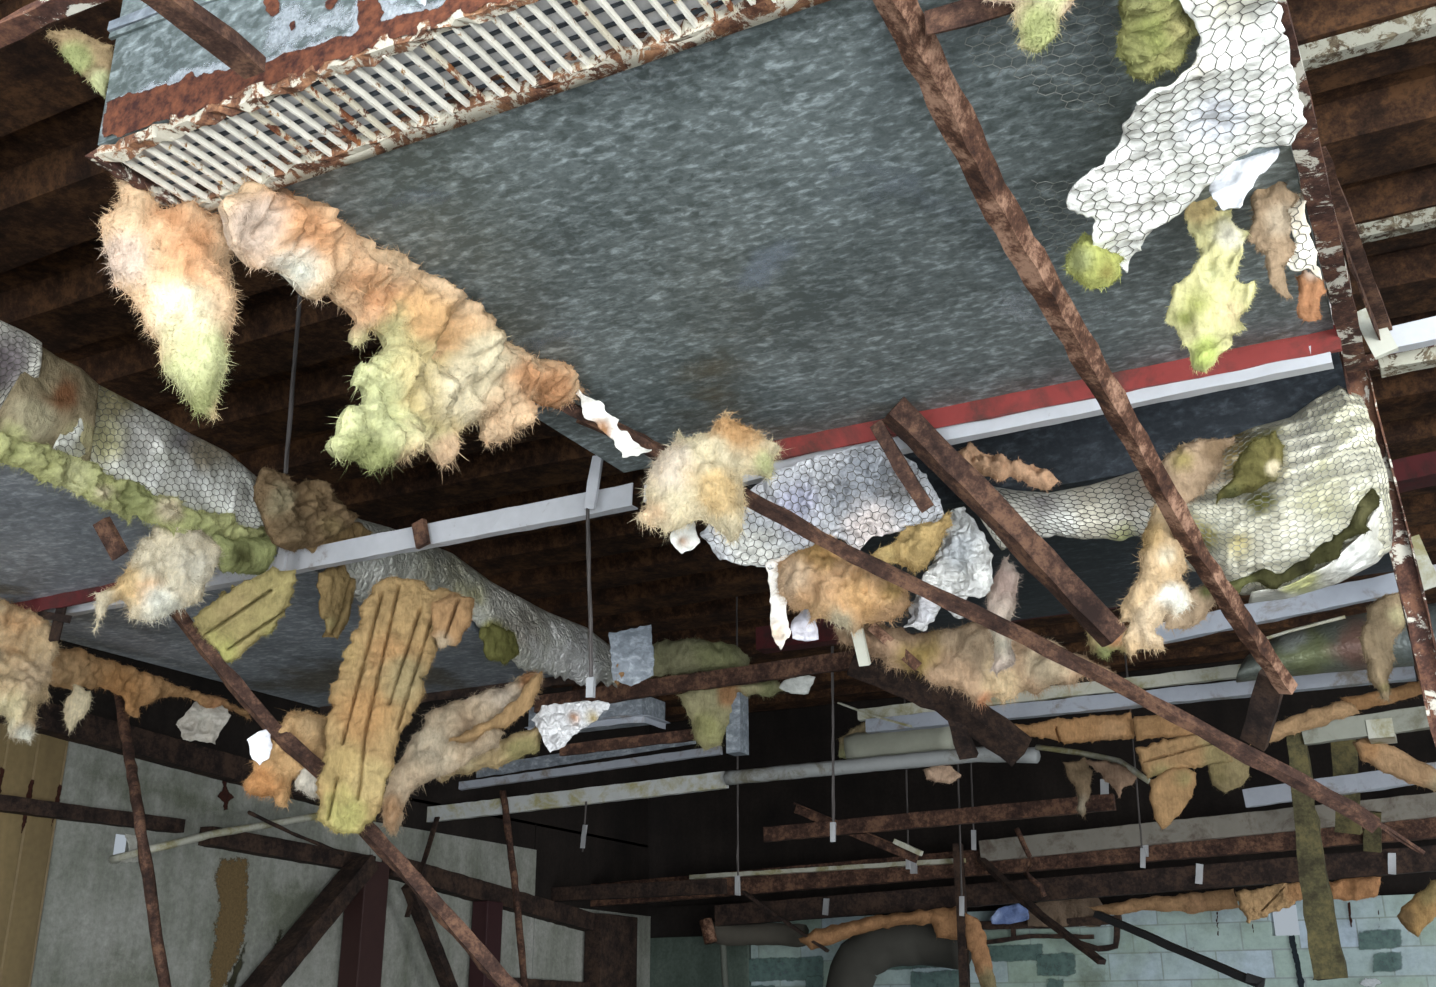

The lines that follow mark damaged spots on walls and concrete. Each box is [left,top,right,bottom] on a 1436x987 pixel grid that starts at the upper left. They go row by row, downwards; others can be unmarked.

corrosion [102,0,502,138]
corrosion [246,0,830,191]
corrosion [193,182,239,212]